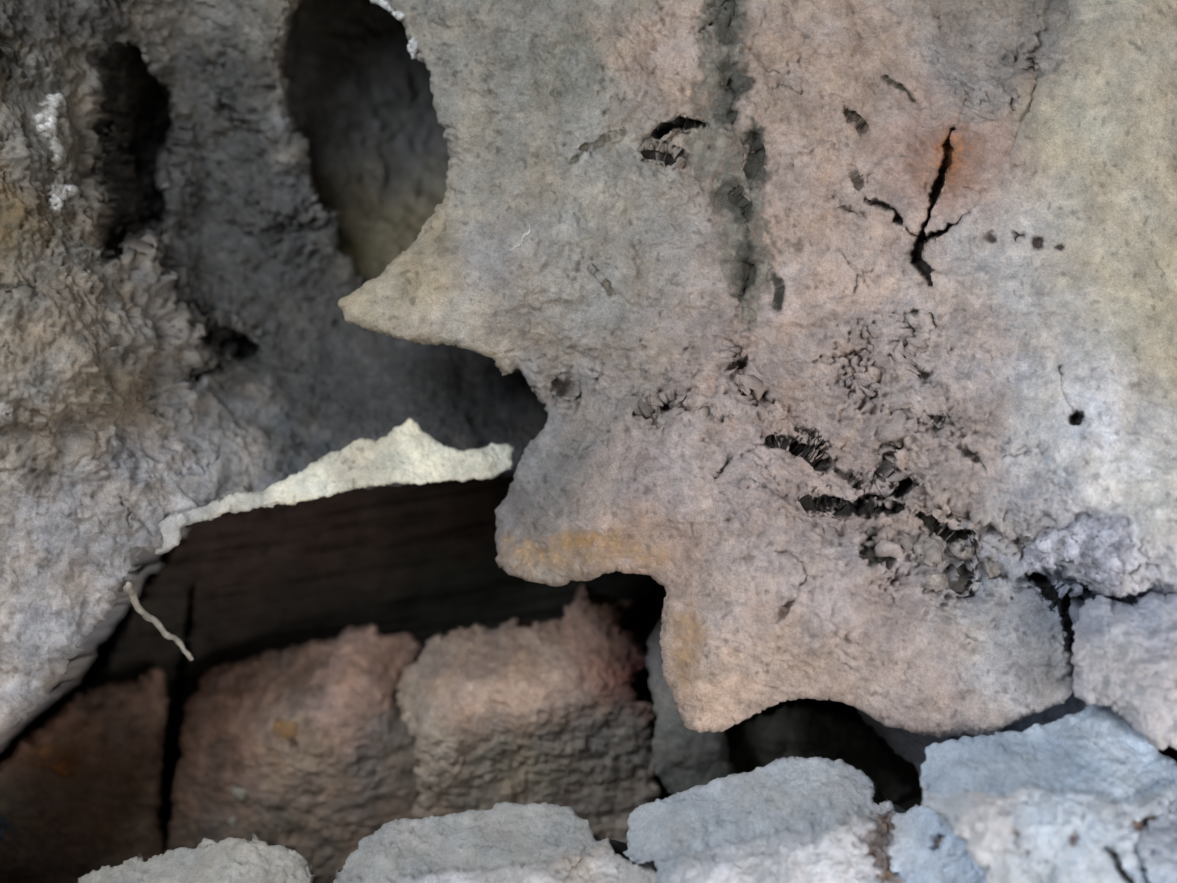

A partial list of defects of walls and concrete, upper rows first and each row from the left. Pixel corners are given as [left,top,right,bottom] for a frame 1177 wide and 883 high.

peeling [370,0,405,22]
peeling [407,38,418,59]
crack [883,75,915,102]
crack [844,109,869,133]
crack [569,81,765,222]
rust [911,126,983,194]
crack [843,128,955,286]
crack [595,270,613,296]
crack [741,259,784,311]
crack [924,413,986,467]
crack [764,427,978,573]